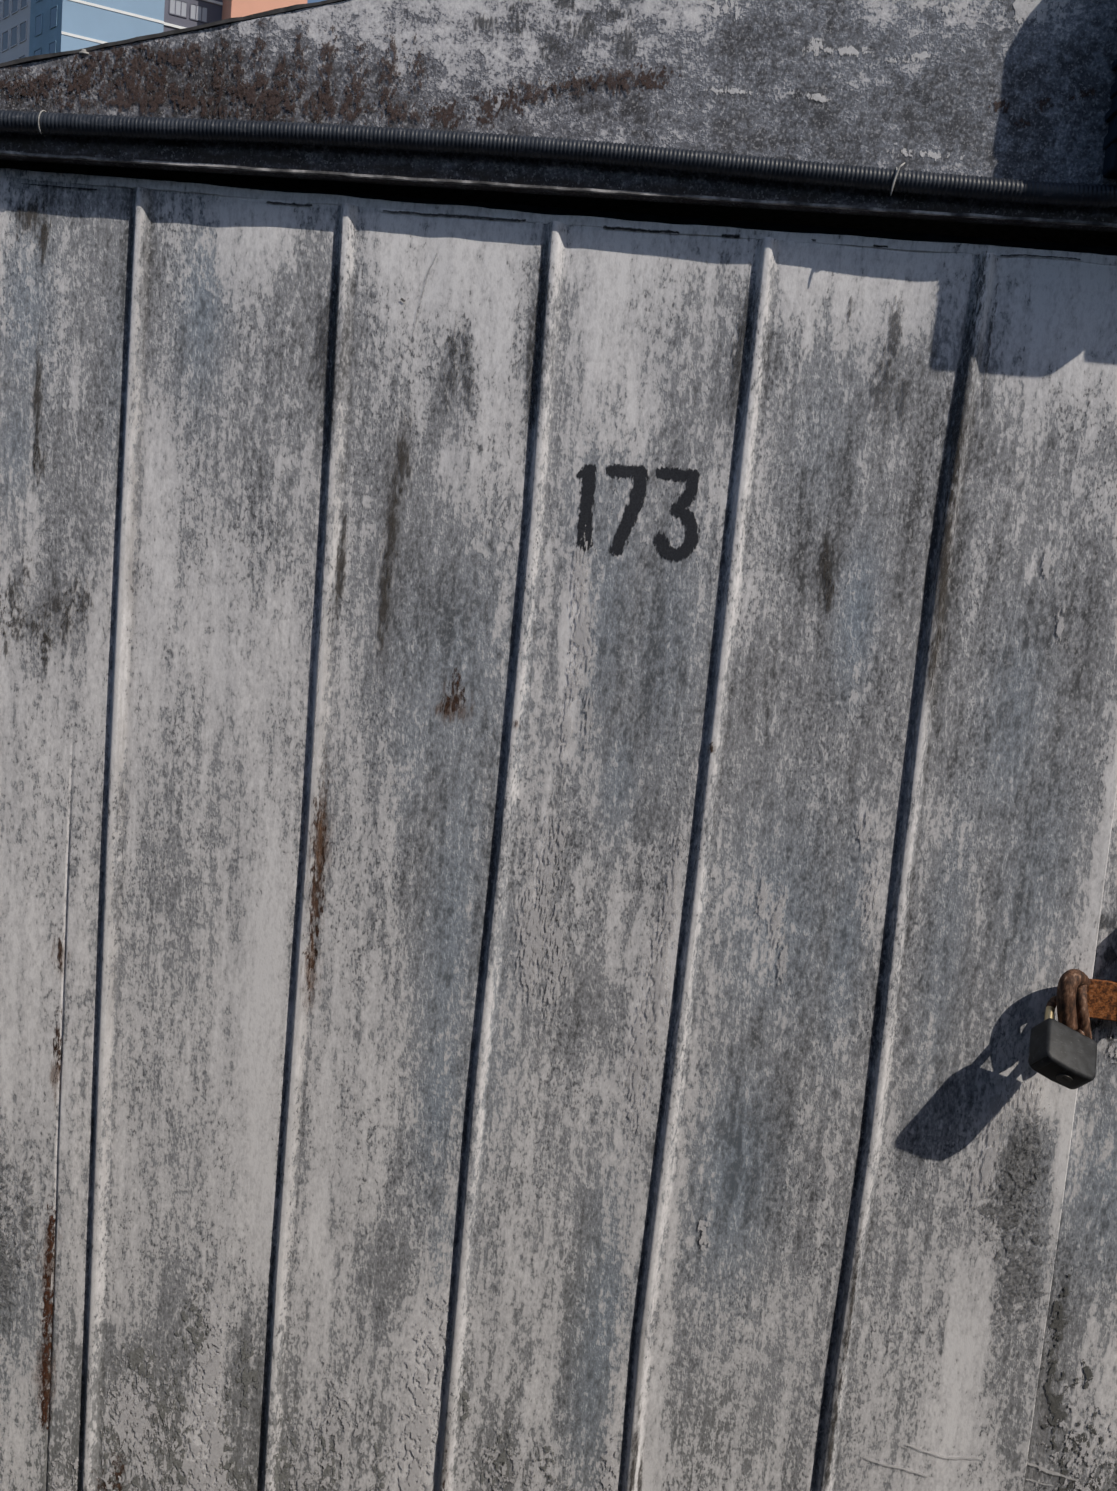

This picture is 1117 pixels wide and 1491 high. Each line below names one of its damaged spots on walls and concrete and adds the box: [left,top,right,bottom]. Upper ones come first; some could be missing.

leakage [869,296,910,432]
leakage [949,251,999,463]
corrosion [440,668,466,715]
corrosion [303,749,330,1007]
corrosion [35,1196,56,1430]
corrosion [92,1437,124,1491]